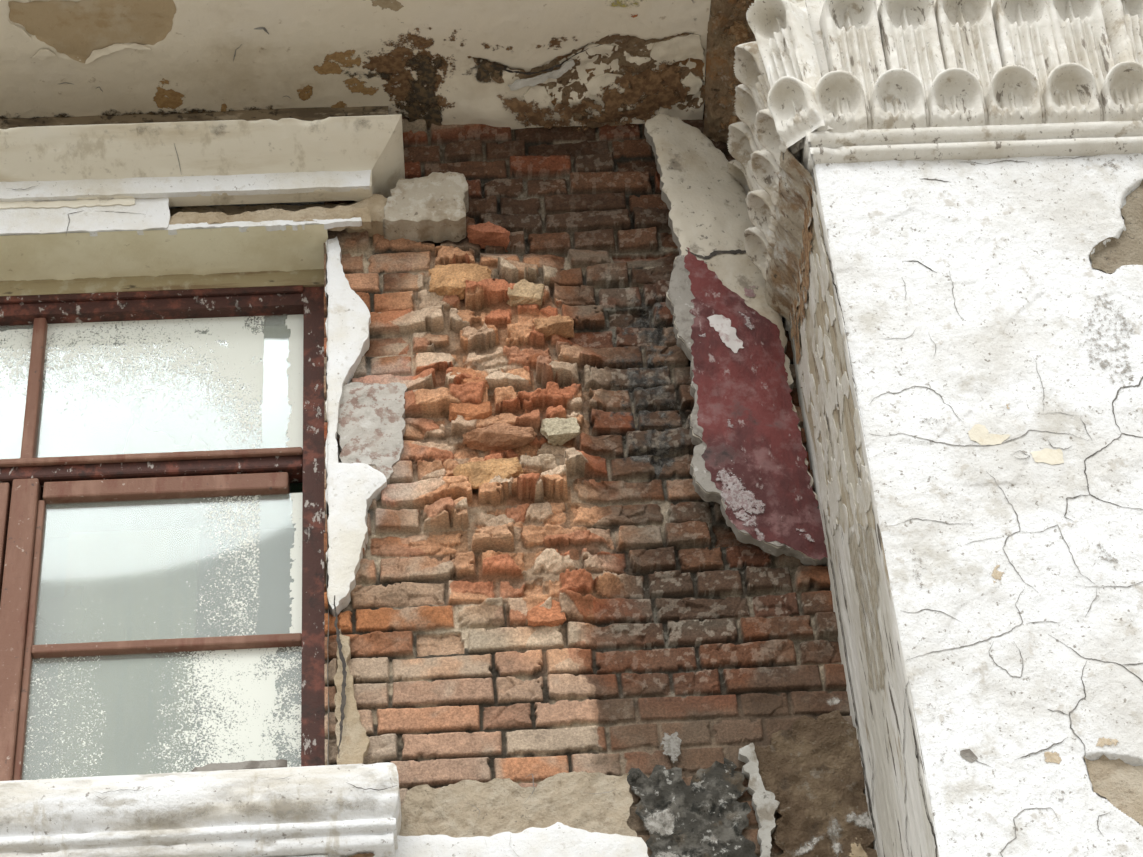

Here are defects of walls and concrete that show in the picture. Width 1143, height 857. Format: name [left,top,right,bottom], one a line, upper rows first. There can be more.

peeling [8,0,176,64]
flaking render [468,32,706,129]
flaking render [169,202,372,231]
flaking render [1090,180,1143,274]
flaking render [337,382,407,484]
spalling [448,367,580,489]
peeling [790,191,885,692]
crack [811,197,1143,857]
flaking render [334,628,370,765]
flaking render [399,771,637,838]
damp [627,758,757,857]
flaking render [1084,737,1143,826]